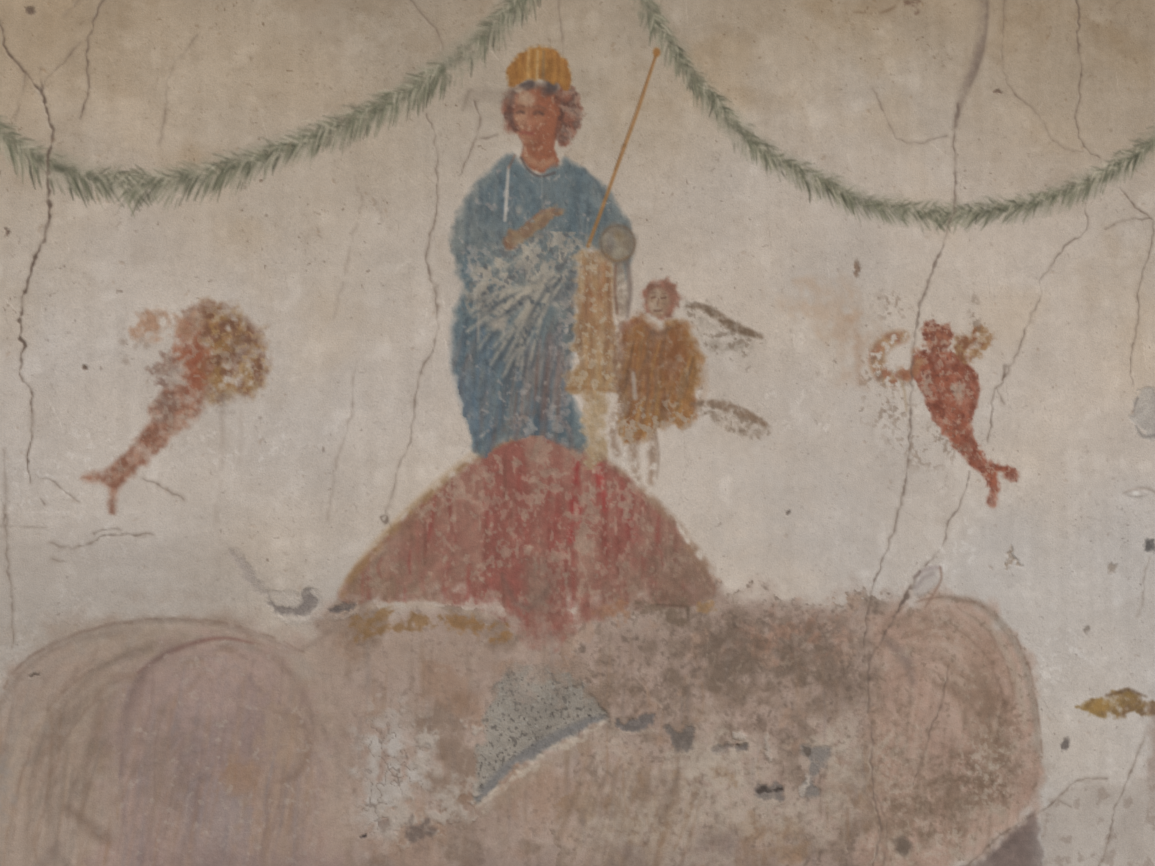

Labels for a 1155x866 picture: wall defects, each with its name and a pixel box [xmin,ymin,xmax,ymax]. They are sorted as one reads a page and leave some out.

crack [0,0,156,651]
crack [378,99,500,531]
crack [984,186,1155,444]
crack [139,475,188,503]
spalling [226,547,360,628]
crack [860,84,972,866]
spalling [340,654,773,861]
spalling [752,742,835,811]
crack [959,734,1148,866]